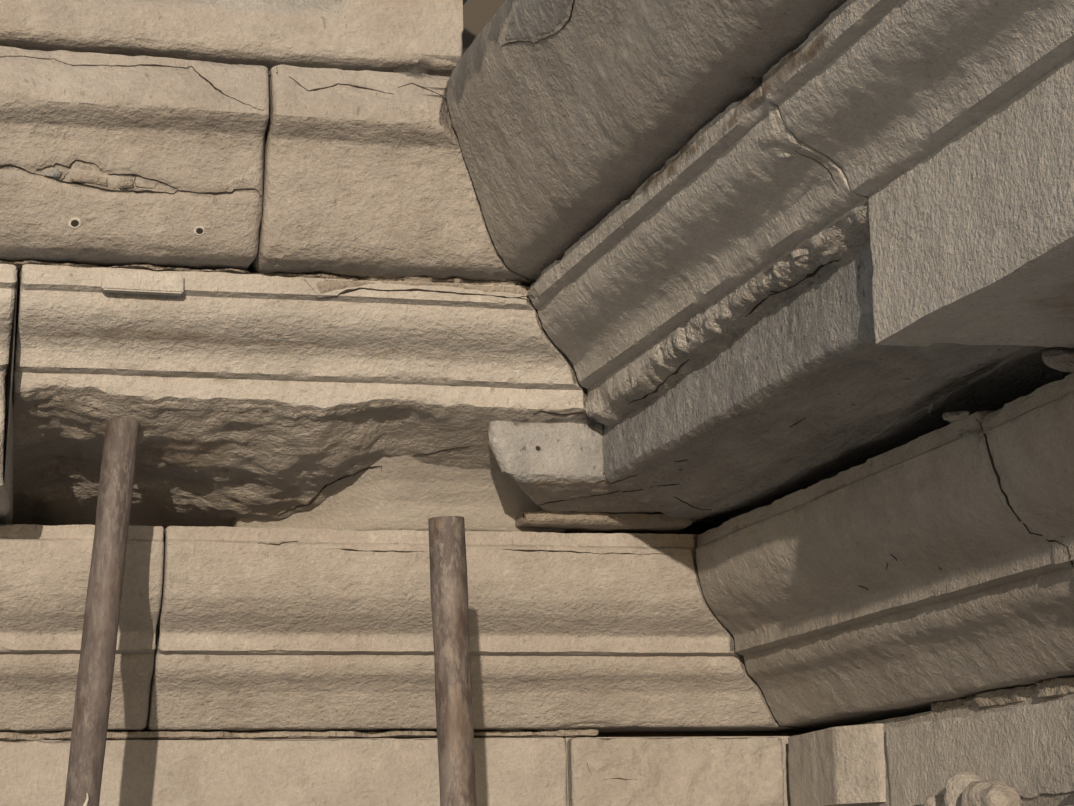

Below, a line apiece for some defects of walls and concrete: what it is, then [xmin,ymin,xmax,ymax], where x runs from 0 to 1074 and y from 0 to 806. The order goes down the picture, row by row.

crack [501,0,575,46]
crack [0,54,264,111]
crack [269,67,441,95]
crack [0,159,261,197]
crack [795,150,838,187]
crack [413,446,469,456]
crack [278,466,382,515]
crack [976,419,1074,567]
crack [342,546,424,554]
crack [507,548,673,556]